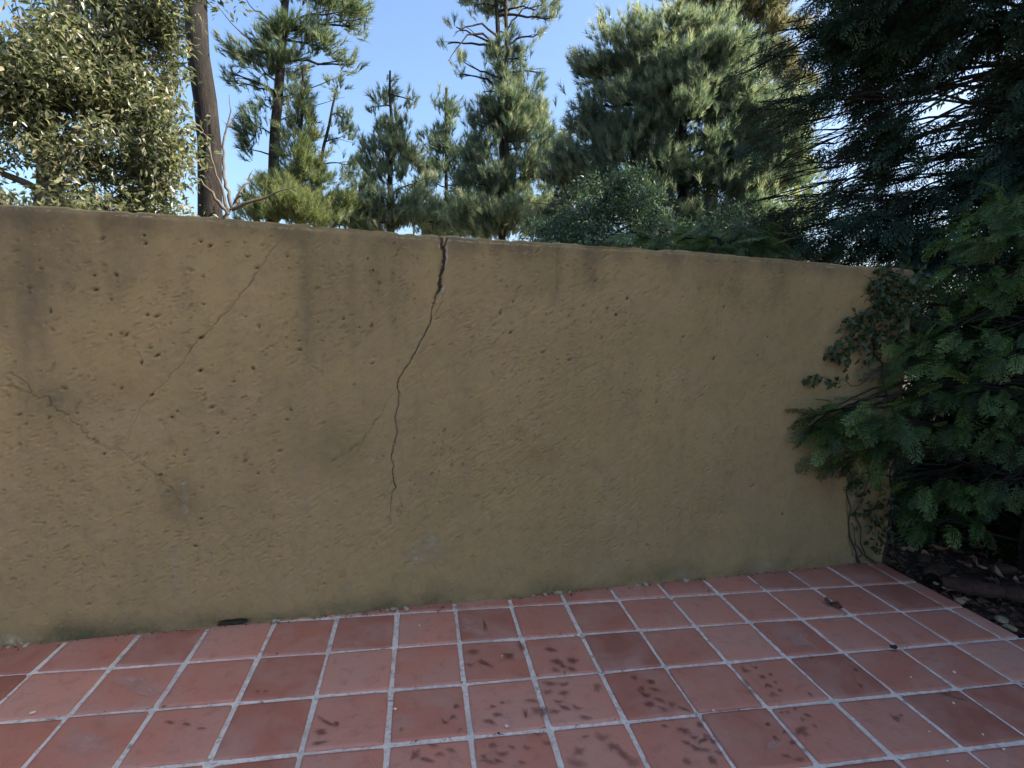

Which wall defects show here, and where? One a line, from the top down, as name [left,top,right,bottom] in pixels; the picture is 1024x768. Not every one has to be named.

crack [389,238,448,517]